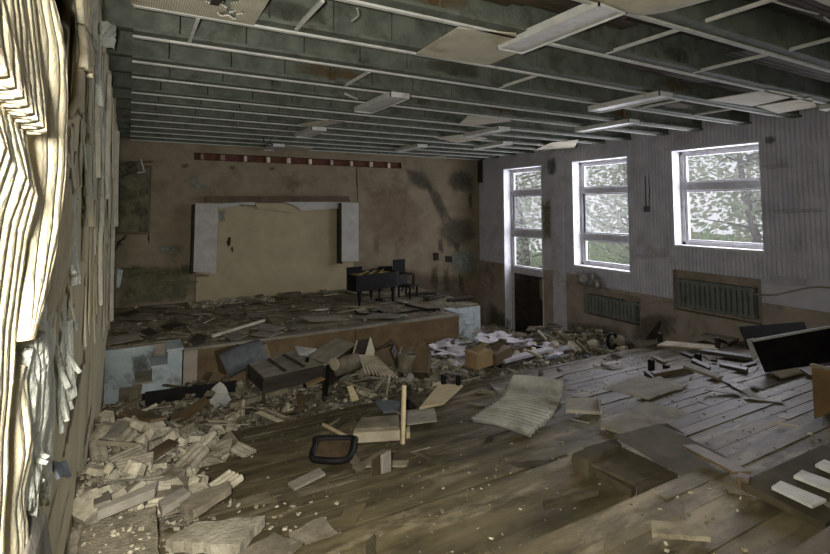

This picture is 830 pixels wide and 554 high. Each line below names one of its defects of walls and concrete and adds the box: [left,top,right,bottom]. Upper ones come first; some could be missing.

flaking render [5,0,142,554]
water stain [408,171,472,251]